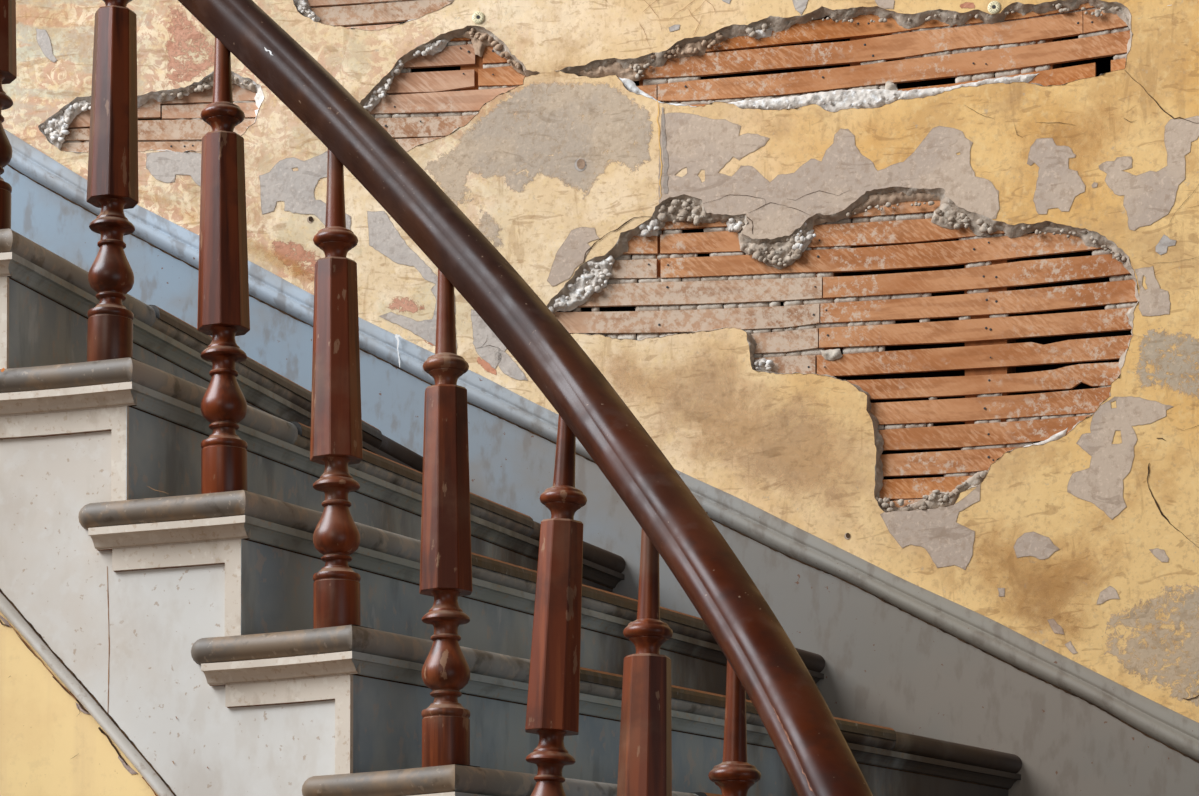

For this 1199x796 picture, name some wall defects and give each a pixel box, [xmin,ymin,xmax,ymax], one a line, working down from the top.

spalling [293,0,454,31]
spalling [38,96,91,153]
spalling [137,6,215,187]
spalling [231,71,264,135]
spalling [360,0,1199,570]
crack [1147,425,1199,548]
peeling [1096,577,1199,706]